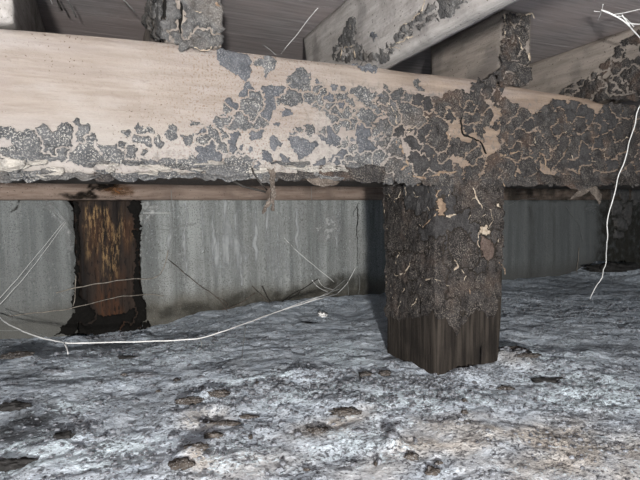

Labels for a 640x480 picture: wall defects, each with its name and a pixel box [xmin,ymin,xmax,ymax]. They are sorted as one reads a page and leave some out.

peeling [0,0,640,336]